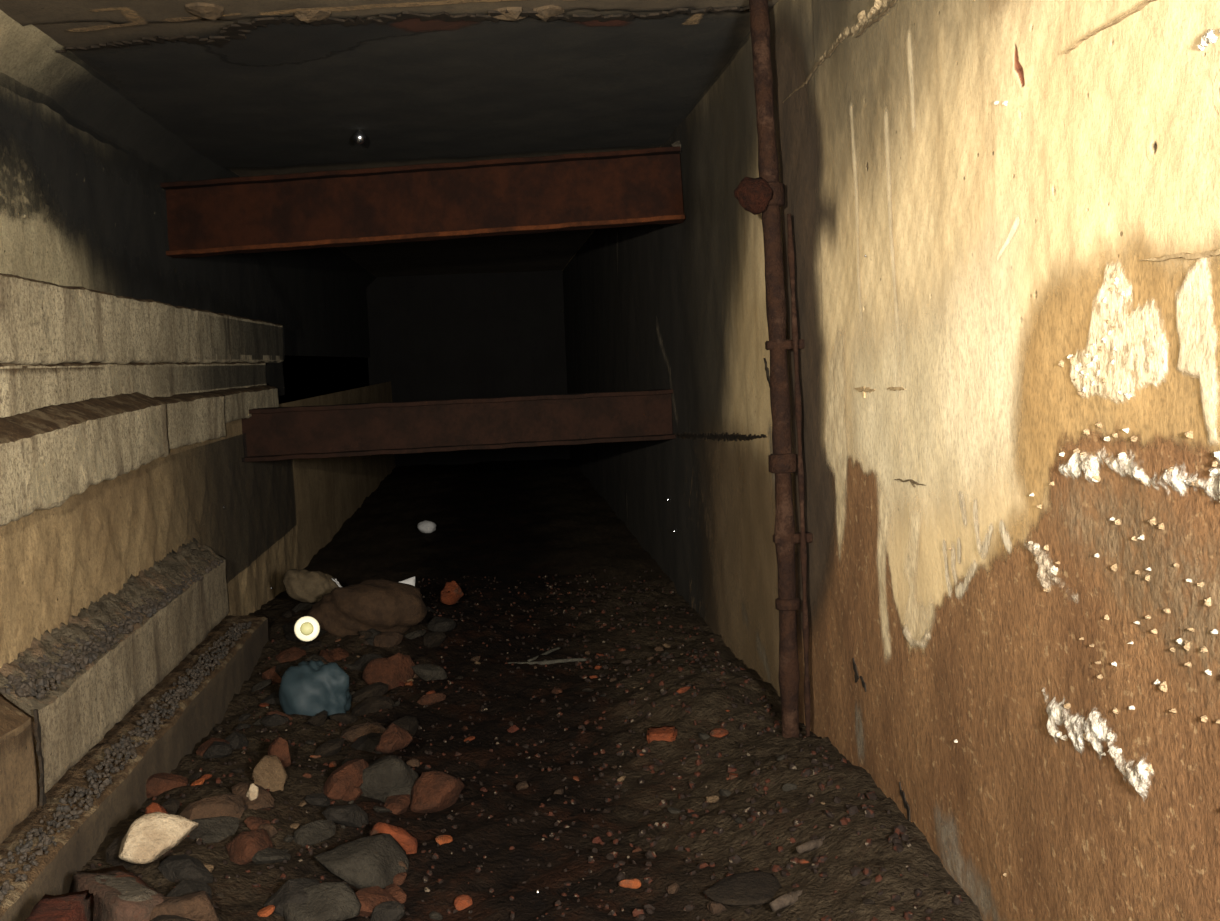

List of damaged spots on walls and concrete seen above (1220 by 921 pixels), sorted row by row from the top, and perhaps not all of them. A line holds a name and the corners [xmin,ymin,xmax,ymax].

crack [783,0,896,103]
crack [1064,0,1157,54]
peeling [1058,258,1218,443]
leakage [689,427,780,697]
leakage [774,24,1220,921]
spalling [1069,499,1220,675]